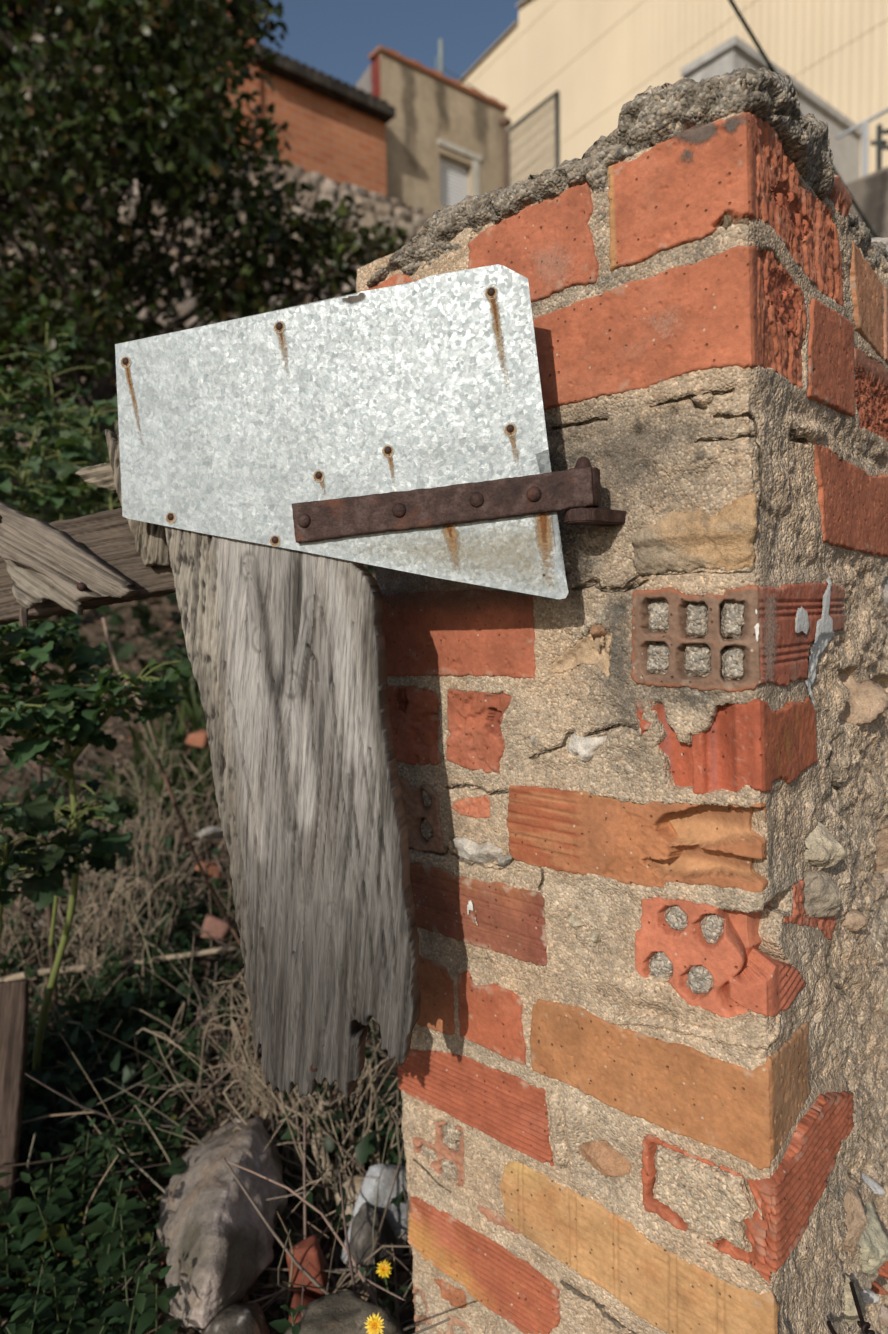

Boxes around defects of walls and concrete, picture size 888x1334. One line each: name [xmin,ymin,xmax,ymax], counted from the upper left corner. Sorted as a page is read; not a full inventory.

damp [403,64,416,144]
damp [435,81,447,121]
damp [865,170,887,238]